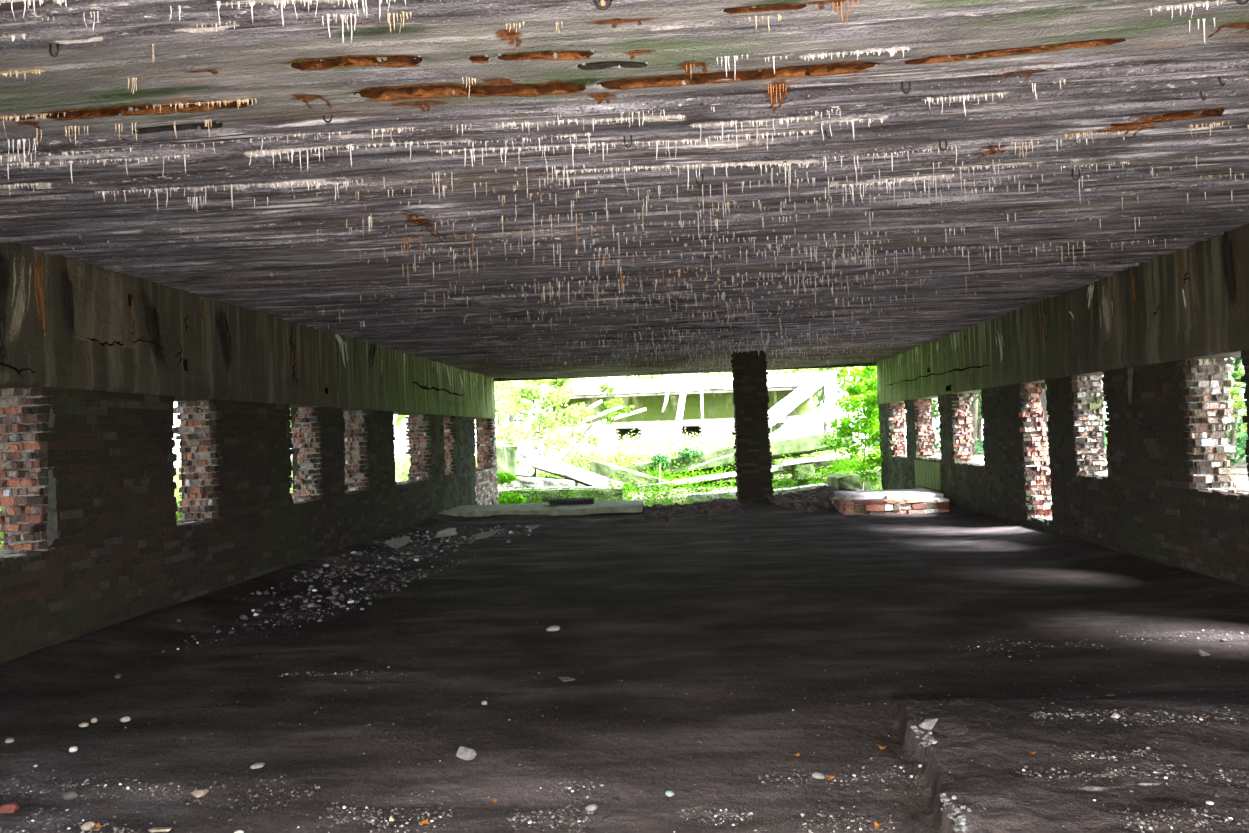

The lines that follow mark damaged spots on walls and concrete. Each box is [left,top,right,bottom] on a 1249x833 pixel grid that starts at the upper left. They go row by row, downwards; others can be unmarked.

rust [805,0,845,9]
damp [1142,0,1227,12]
efflorescence [176,0,356,33]
damp [55,34,103,44]
damp [799,46,911,60]
rust [677,62,707,76]
damp [153,97,258,109]
damp [922,91,1043,114]
damp [0,110,961,190]
efflorescence [829,158,1131,189]
efflorescence [98,177,358,196]
crack [0,363,36,377]